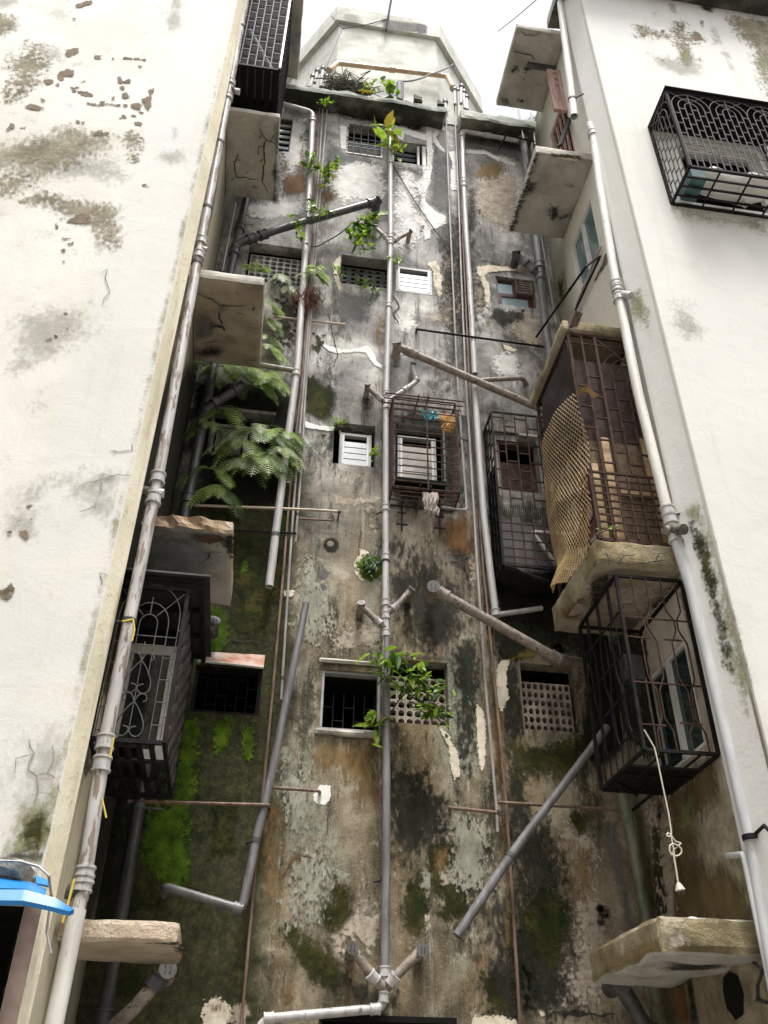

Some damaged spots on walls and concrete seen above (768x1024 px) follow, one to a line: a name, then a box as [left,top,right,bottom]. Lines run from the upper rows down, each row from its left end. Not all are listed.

leakage [0,39,54,104]
peeling [44,48,154,126]
leakage [635,21,706,66]
leakage [0,123,144,249]
crack [232,128,278,194]
leakage [508,154,539,232]
crack [198,292,256,344]
leakage [688,520,733,672]
peeling [496,649,537,711]
crack [15,740,61,806]
leakage [389,536,658,1024]
leakage [7,812,51,859]